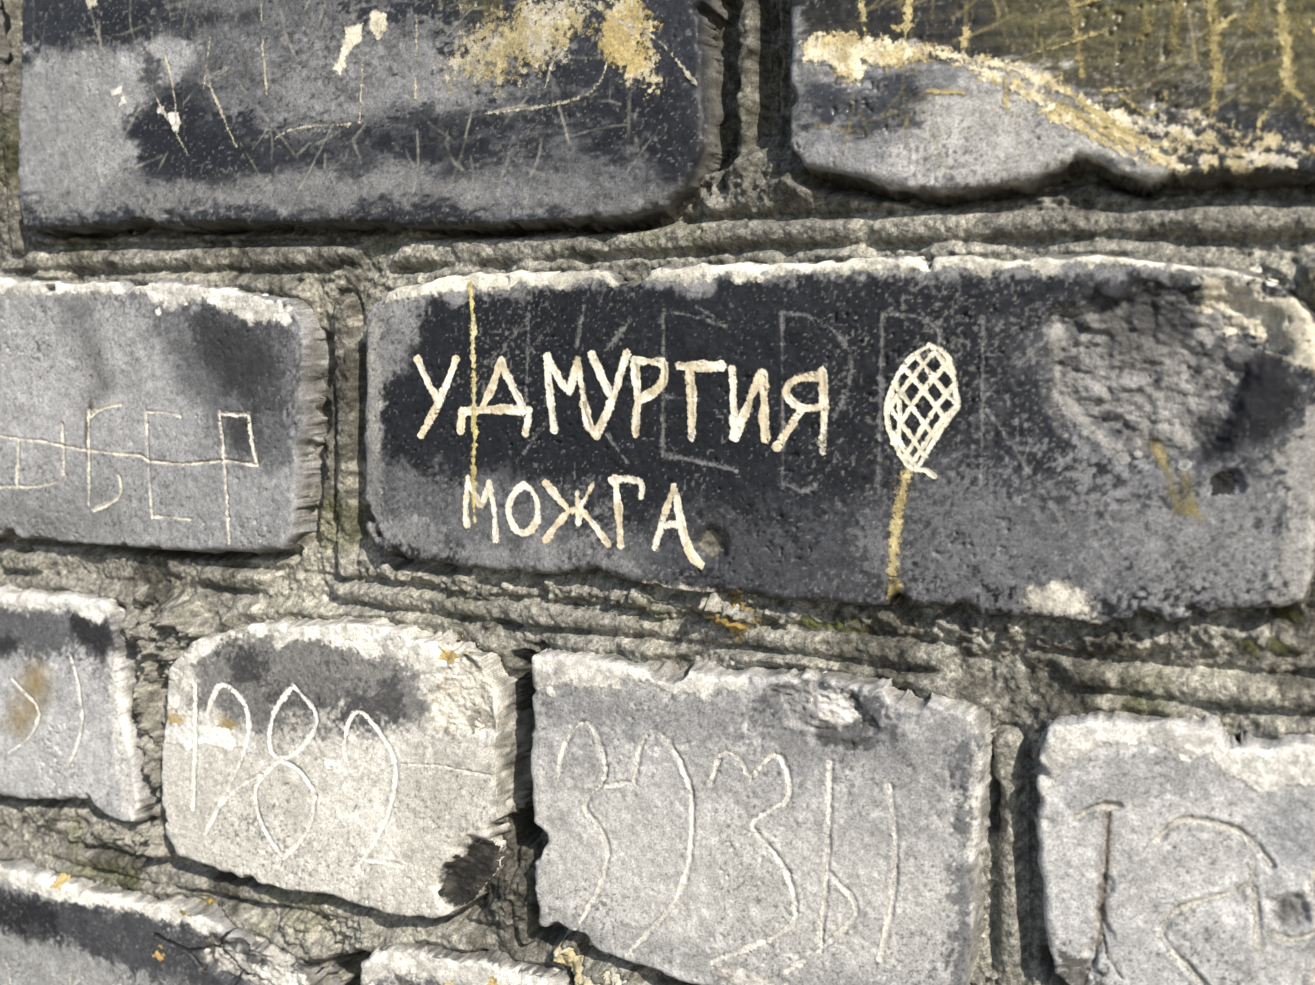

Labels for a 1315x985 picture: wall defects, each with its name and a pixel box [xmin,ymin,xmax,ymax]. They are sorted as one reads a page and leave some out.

peeling [437,0,663,99]
peeling [799,30,1315,176]
crack [153,927,261,985]